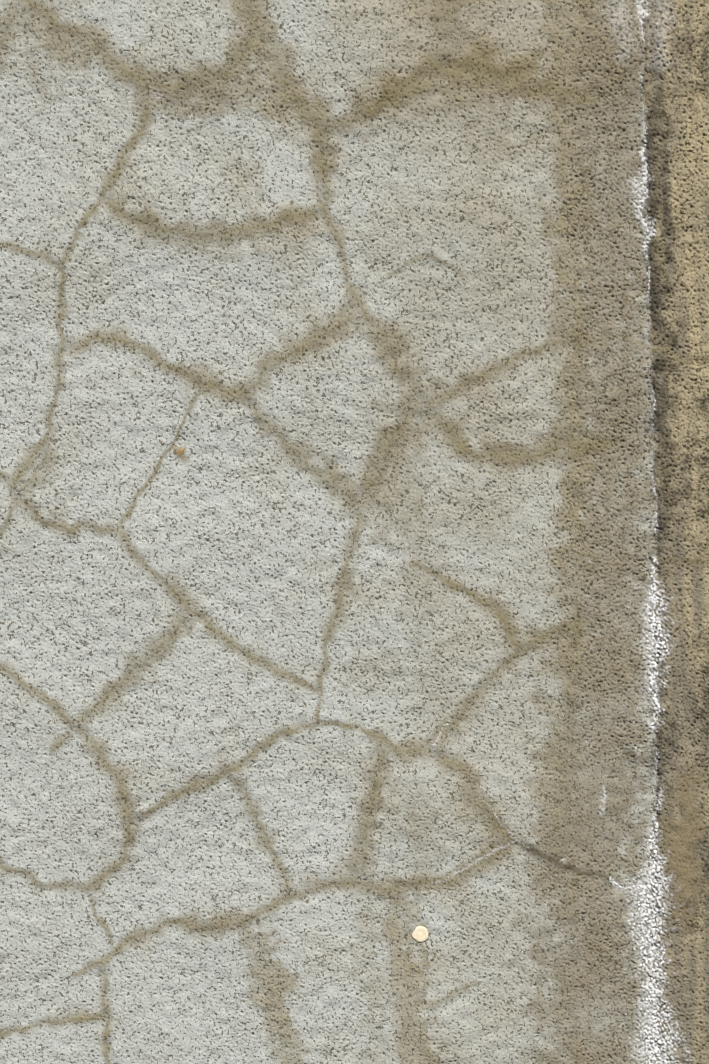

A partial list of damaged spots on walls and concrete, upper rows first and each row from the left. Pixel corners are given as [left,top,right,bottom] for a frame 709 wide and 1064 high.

leakage [636,0,658,40]
crack [27,0,341,248]
leakage [634,107,677,346]
crack [59,256,260,420]
crack [0,380,184,552]
leakage [600,352,677,503]
leakage [560,459,674,760]
crack [0,934,143,1064]
crack [87,746,240,889]
crack [261,712,455,808]
crack [324,804,632,893]
leakage [557,785,709,1064]